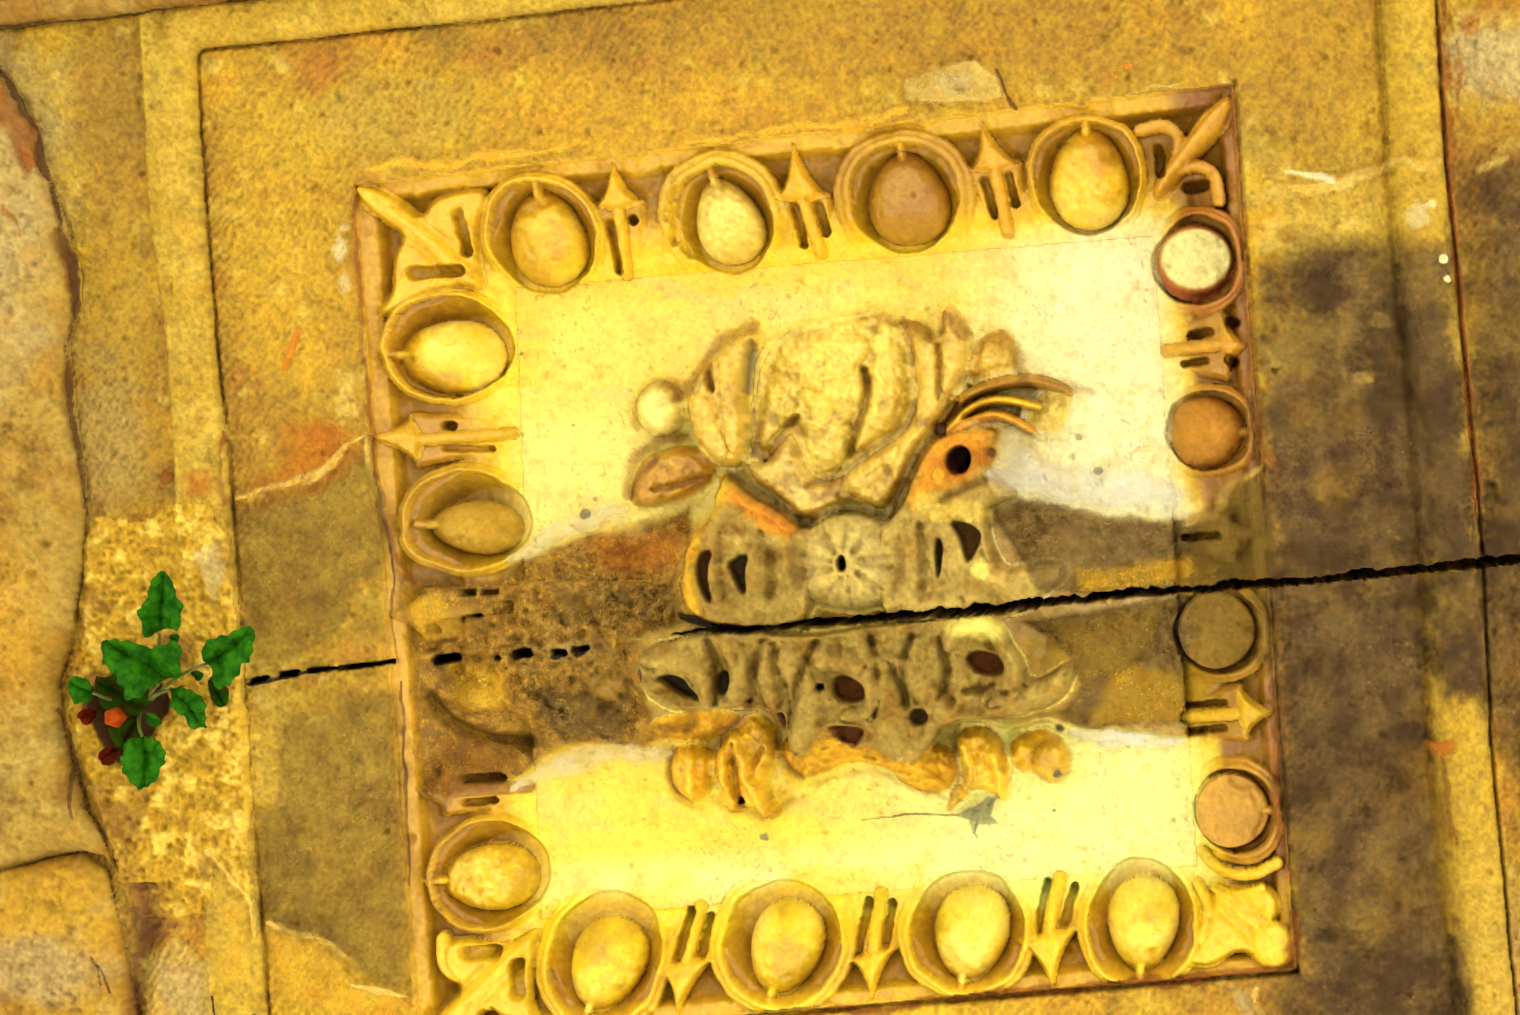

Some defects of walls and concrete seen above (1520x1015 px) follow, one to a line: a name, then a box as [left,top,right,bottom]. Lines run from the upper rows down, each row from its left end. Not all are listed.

crack [678,577,1296,634]
leakage [987,156,1520,1015]
crack [1349,554,1506,575]